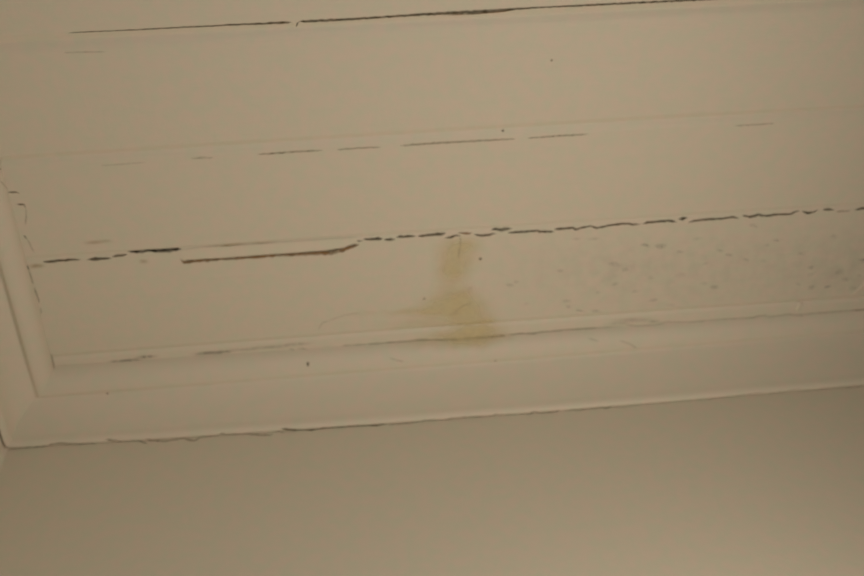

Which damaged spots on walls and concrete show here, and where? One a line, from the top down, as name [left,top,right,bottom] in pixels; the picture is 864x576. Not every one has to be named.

crack [73,0,702,33]
crack [27,209,832,292]
crack [156,424,385,441]